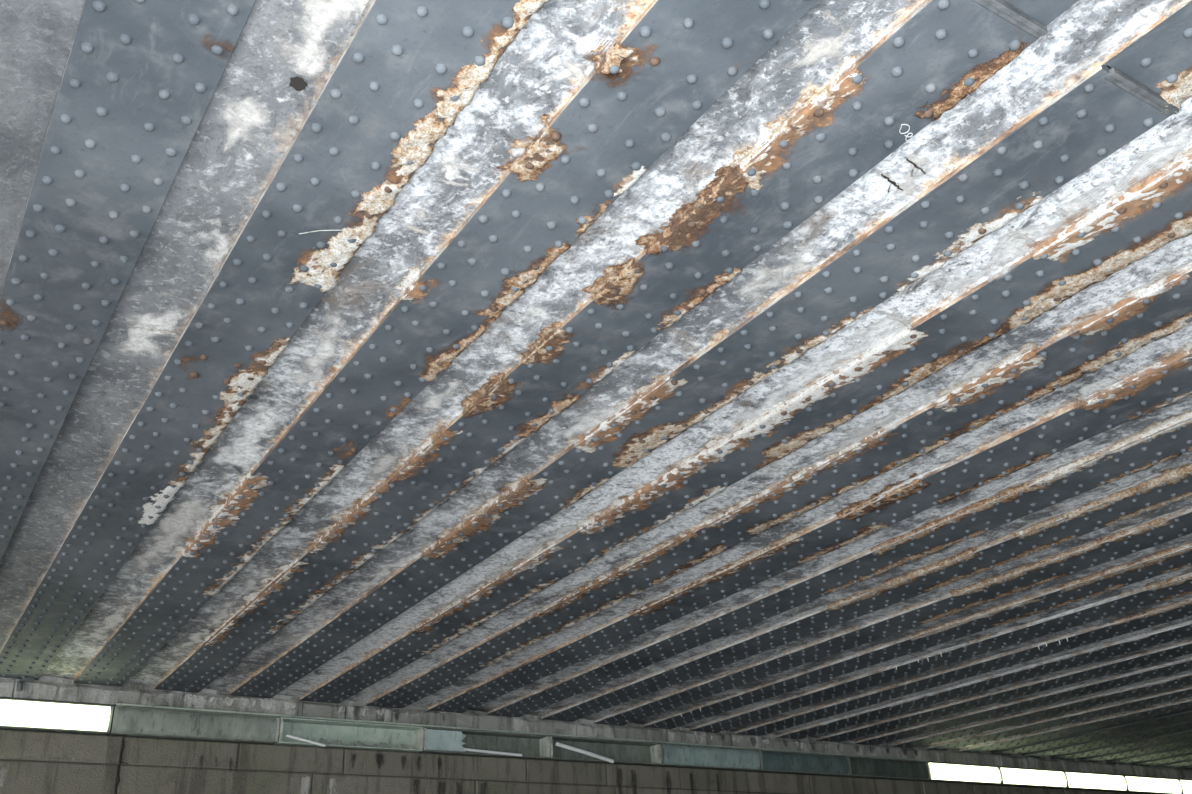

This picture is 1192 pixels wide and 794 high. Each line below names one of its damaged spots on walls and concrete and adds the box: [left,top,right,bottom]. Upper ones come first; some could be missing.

corrosion [289,0,548,292]
corrosion [497,109,566,182]
corrosion [419,165,647,382]
corrosion [586,36,655,87]
corrosion [581,56,867,309]
corrosion [575,211,1192,534]
corrosion [893,191,1043,294]
corrosion [914,40,1027,122]
corrosion [1029,149,1192,261]
corrosion [173,470,268,558]
corrosion [202,350,636,646]
corrosion [413,307,1192,667]